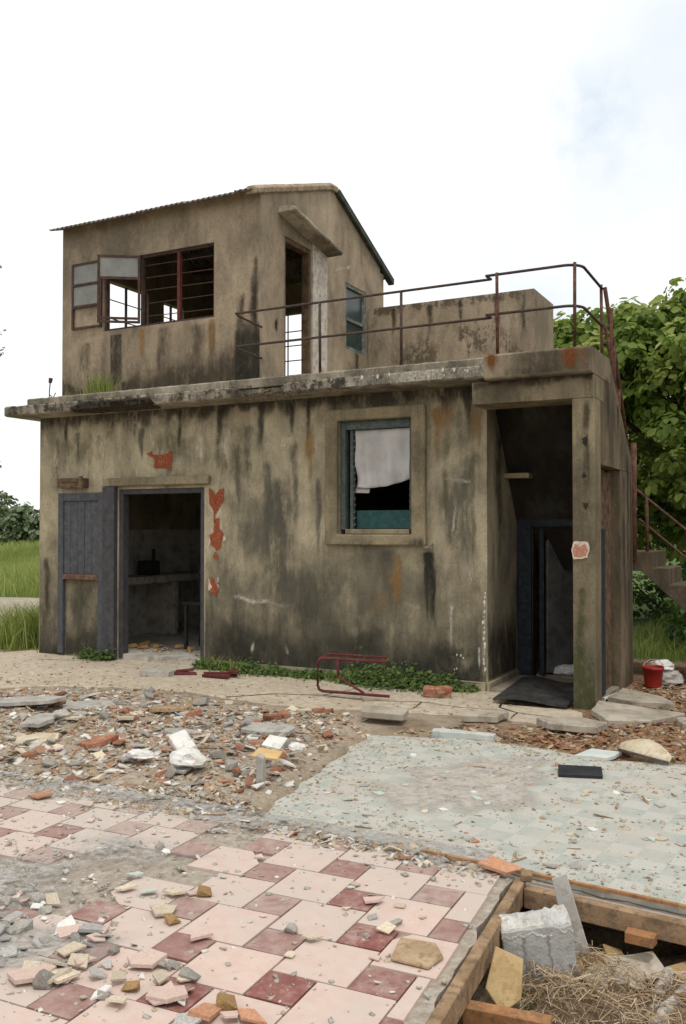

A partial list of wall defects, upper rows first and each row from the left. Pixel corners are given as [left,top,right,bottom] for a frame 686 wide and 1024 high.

water stain [6,259,592,502]
water stain [244,445,297,553]
water stain [312,481,321,546]
water stain [441,460,474,544]
water stain [415,540,435,614]